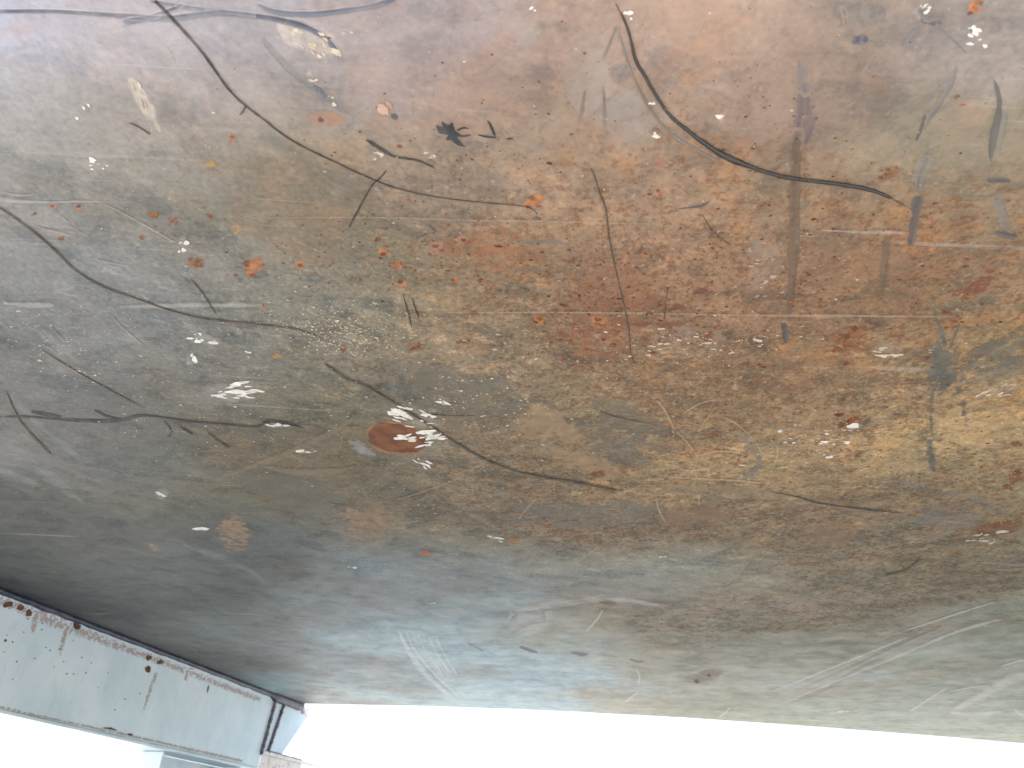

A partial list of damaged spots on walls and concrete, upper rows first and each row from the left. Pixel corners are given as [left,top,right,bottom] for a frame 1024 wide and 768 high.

corrosion [187,257,205,271]
crack [0,0,537,228]
corrosion [203,183,408,288]
crack [0,207,621,492]
corrosion [347,421,427,458]
crack [590,168,635,363]
crack [602,4,903,205]
damp [778,57,816,344]
damp [884,310,1024,537]
corrosion [0,595,261,713]